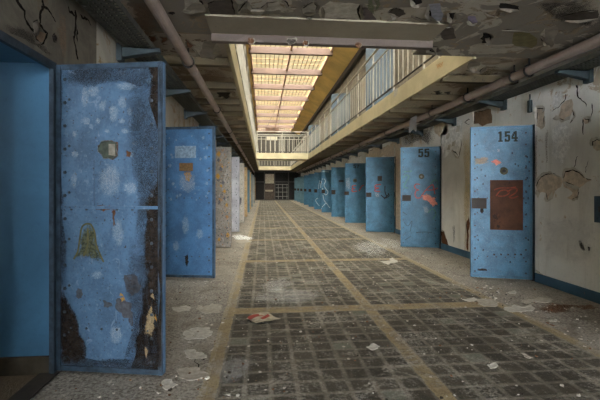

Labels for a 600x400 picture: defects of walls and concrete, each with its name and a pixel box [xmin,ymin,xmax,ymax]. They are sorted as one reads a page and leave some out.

crack [16,0,56,45]
crack [68,6,91,59]
peeling [388,7,406,20]
peeling [410,0,457,40]
peeling [499,3,519,12]
peeling [560,10,599,23]
peeling [473,107,492,126]
peeling [553,99,591,124]
peeling [535,167,591,202]